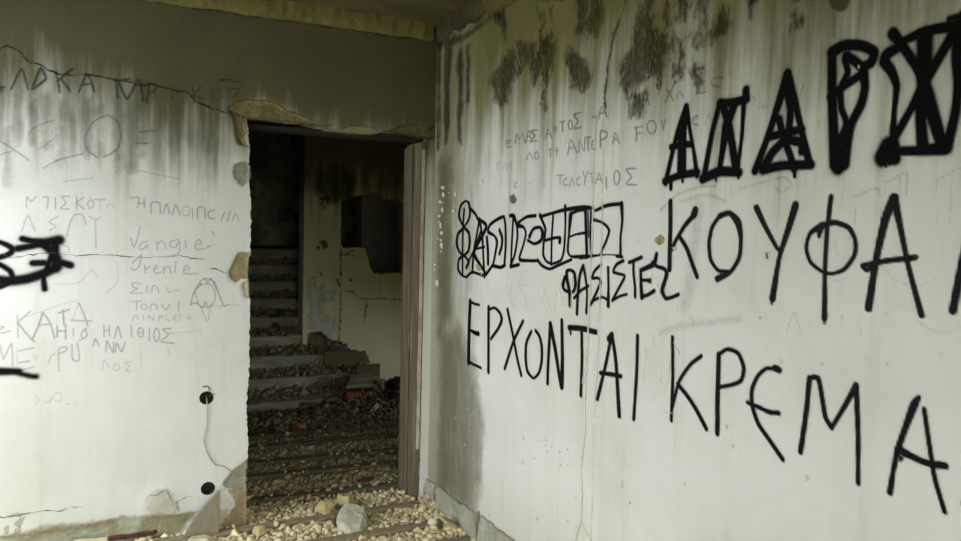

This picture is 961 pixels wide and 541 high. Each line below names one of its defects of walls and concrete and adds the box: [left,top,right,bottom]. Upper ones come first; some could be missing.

water stain [575,0,603,38]
water stain [829,0,849,11]
crack [0,45,304,131]
water stain [436,26,477,149]
water stain [492,14,555,111]
water stain [566,48,589,95]
water stain [620,0,728,117]
spalling [229,100,435,148]
spalling [229,252,250,298]